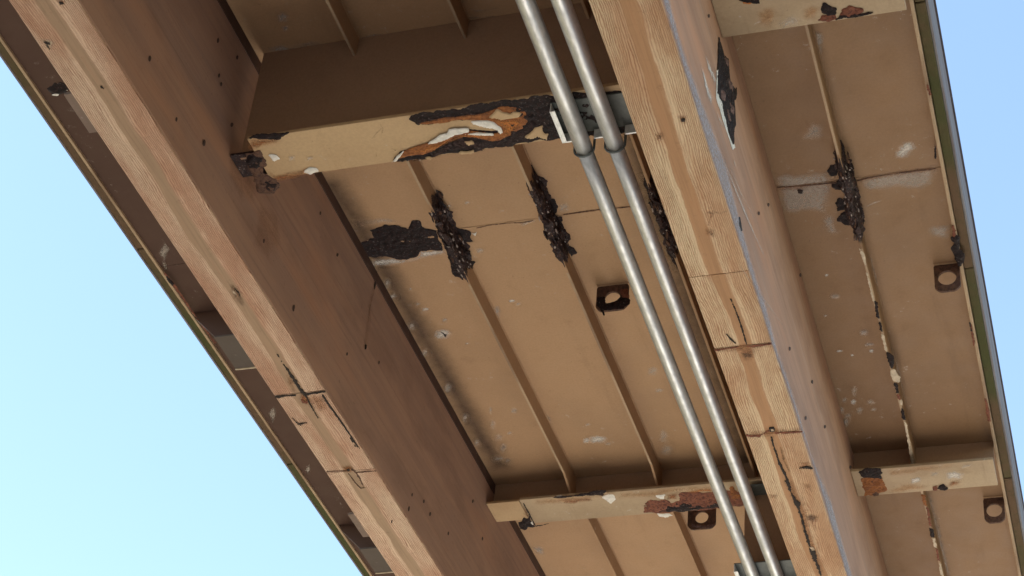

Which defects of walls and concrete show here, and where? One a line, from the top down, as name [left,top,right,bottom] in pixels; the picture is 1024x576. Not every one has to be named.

rust [818,3,873,22]
rust [392,95,561,162]
rust [572,92,597,136]
peeling [361,220,443,264]
spalling [664,0,807,436]
crack [715,299,772,351]
crack [275,354,376,489]
rust [644,486,743,513]
crack [746,430,822,576]
peeling [799,463,851,576]
rust [858,468,888,496]